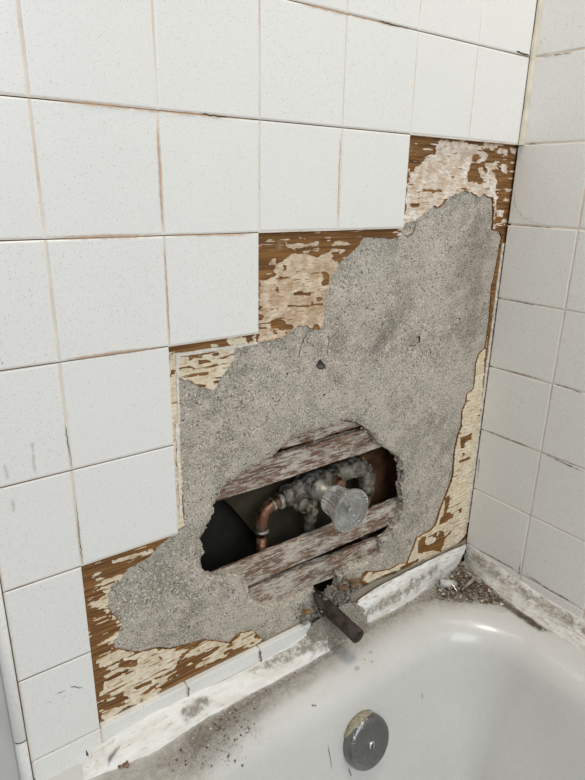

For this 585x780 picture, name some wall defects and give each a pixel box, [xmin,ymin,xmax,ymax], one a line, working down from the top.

flaking render [87,139,518,720]